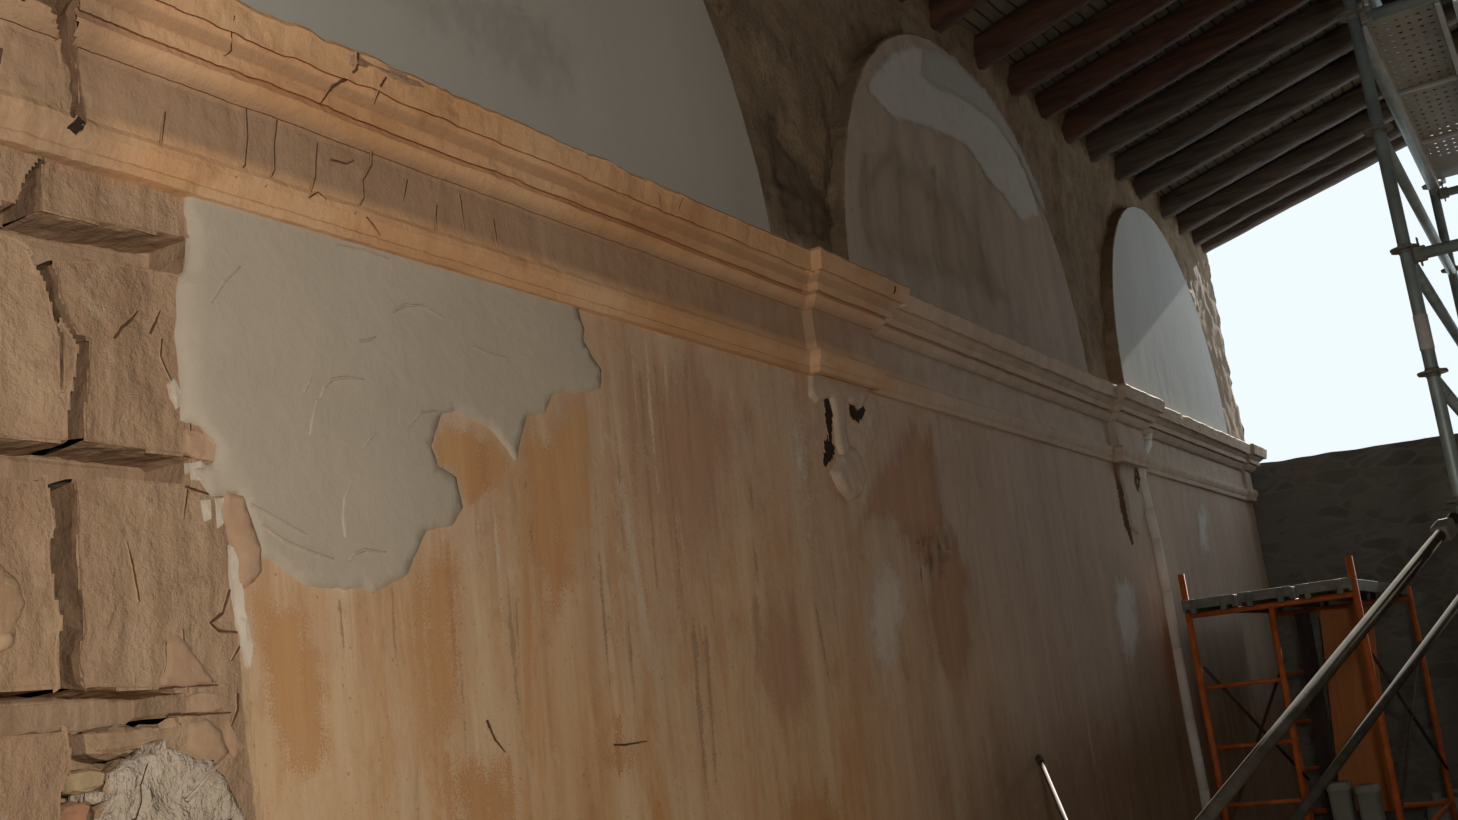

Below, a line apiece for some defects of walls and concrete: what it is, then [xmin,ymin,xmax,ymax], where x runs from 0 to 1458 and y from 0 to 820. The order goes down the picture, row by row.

crack [319,52,387,105]
crack [0,0,172,440]
crack [235,108,278,187]
crack [308,142,380,236]
crack [402,178,498,247]
peeling [167,379,181,410]
peeling [182,429,215,482]
crack [42,474,88,693]
crack [125,540,140,602]
peeling [200,491,262,669]
leakage [615,338,720,818]
spalling [58,635,245,820]